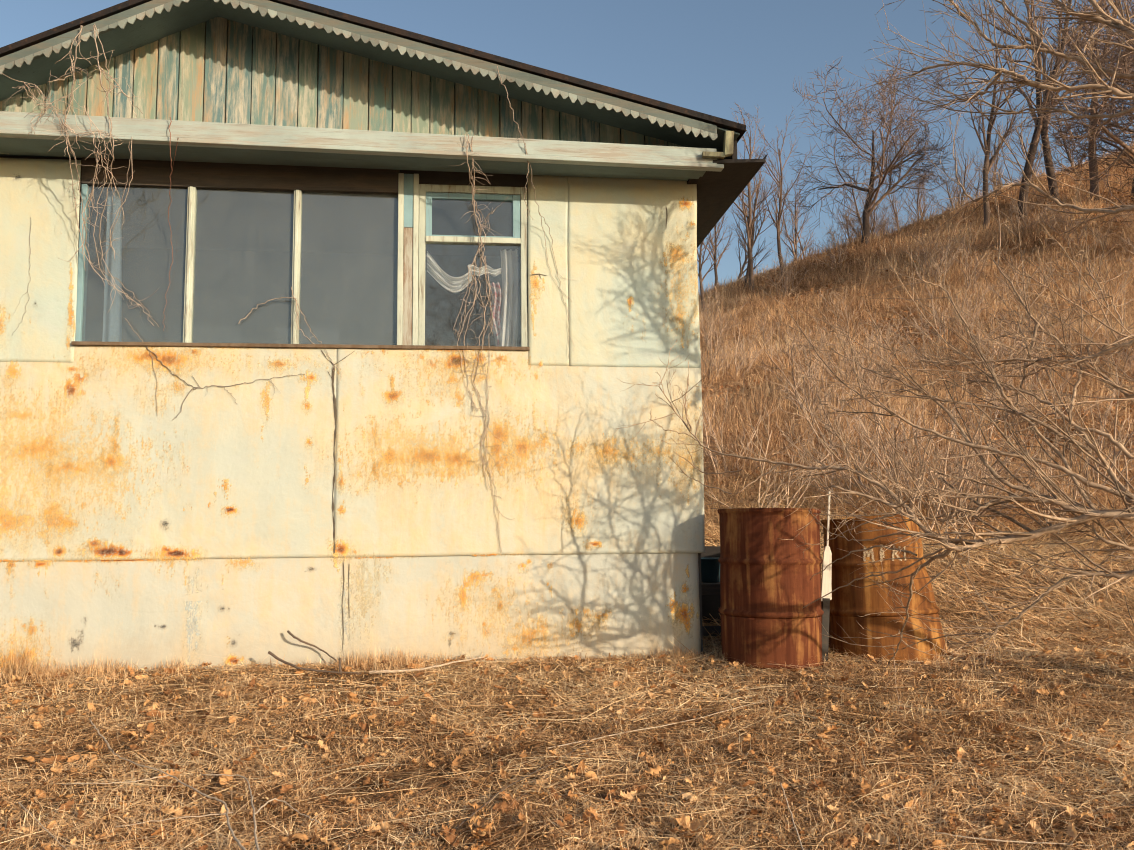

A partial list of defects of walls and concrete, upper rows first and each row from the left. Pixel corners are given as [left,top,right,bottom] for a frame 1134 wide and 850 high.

corrosion [123,346,249,393]
corrosion [302,364,316,409]
corrosion [382,375,401,403]
corrosion [0,362,200,585]
corrosion [337,411,551,513]
corrosion [459,571,503,610]
corrosion [570,608,610,636]
corrosion [667,566,699,633]